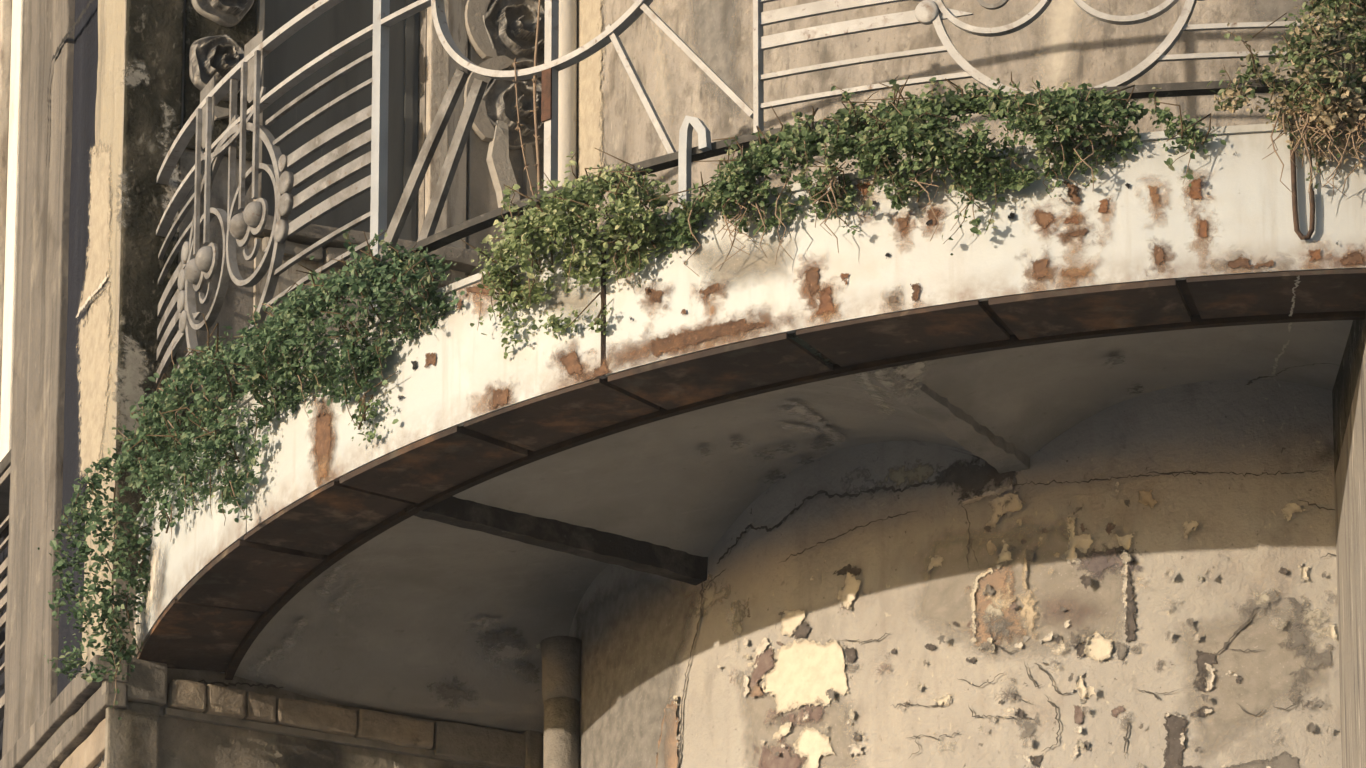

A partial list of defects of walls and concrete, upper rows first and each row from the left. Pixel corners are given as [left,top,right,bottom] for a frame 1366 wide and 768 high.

rust [1028,181,1112,289]
rust [554,283,791,381]
rust [802,262,849,322]
rust [310,400,336,479]
crack [1014,470,1335,510]
damp [921,527,1125,654]
flaking render [923,484,1143,760]
peeling [717,599,863,768]
damp [745,683,855,768]
flaking render [1163,618,1243,768]
damp [1186,612,1318,750]
flaking render [1221,728,1299,768]